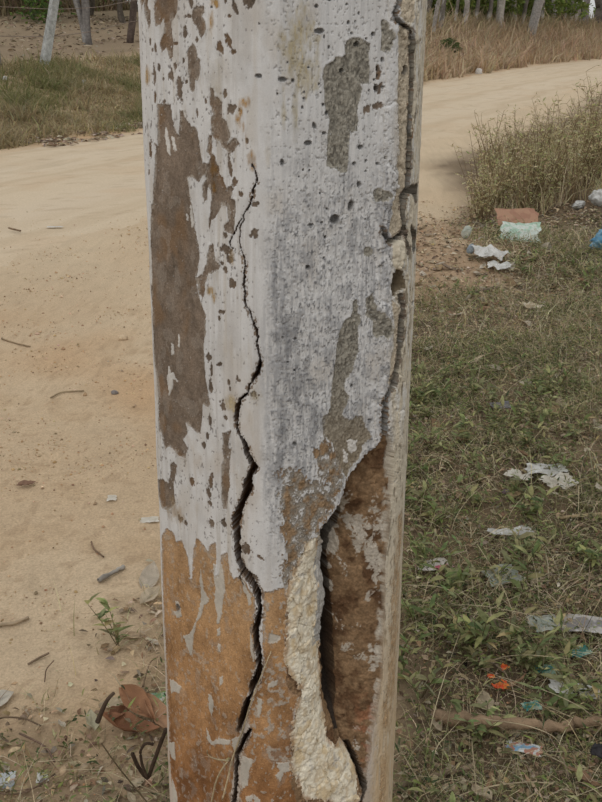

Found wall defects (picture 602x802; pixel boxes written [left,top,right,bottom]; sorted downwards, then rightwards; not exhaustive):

peeling [140,0,249,511]
peeling [224,0,256,18]
spalling [307,207,339,227]
peeling [312,0,415,236]
crack [229,163,264,802]
spalling [161,293,400,802]
crack [343,739,367,802]